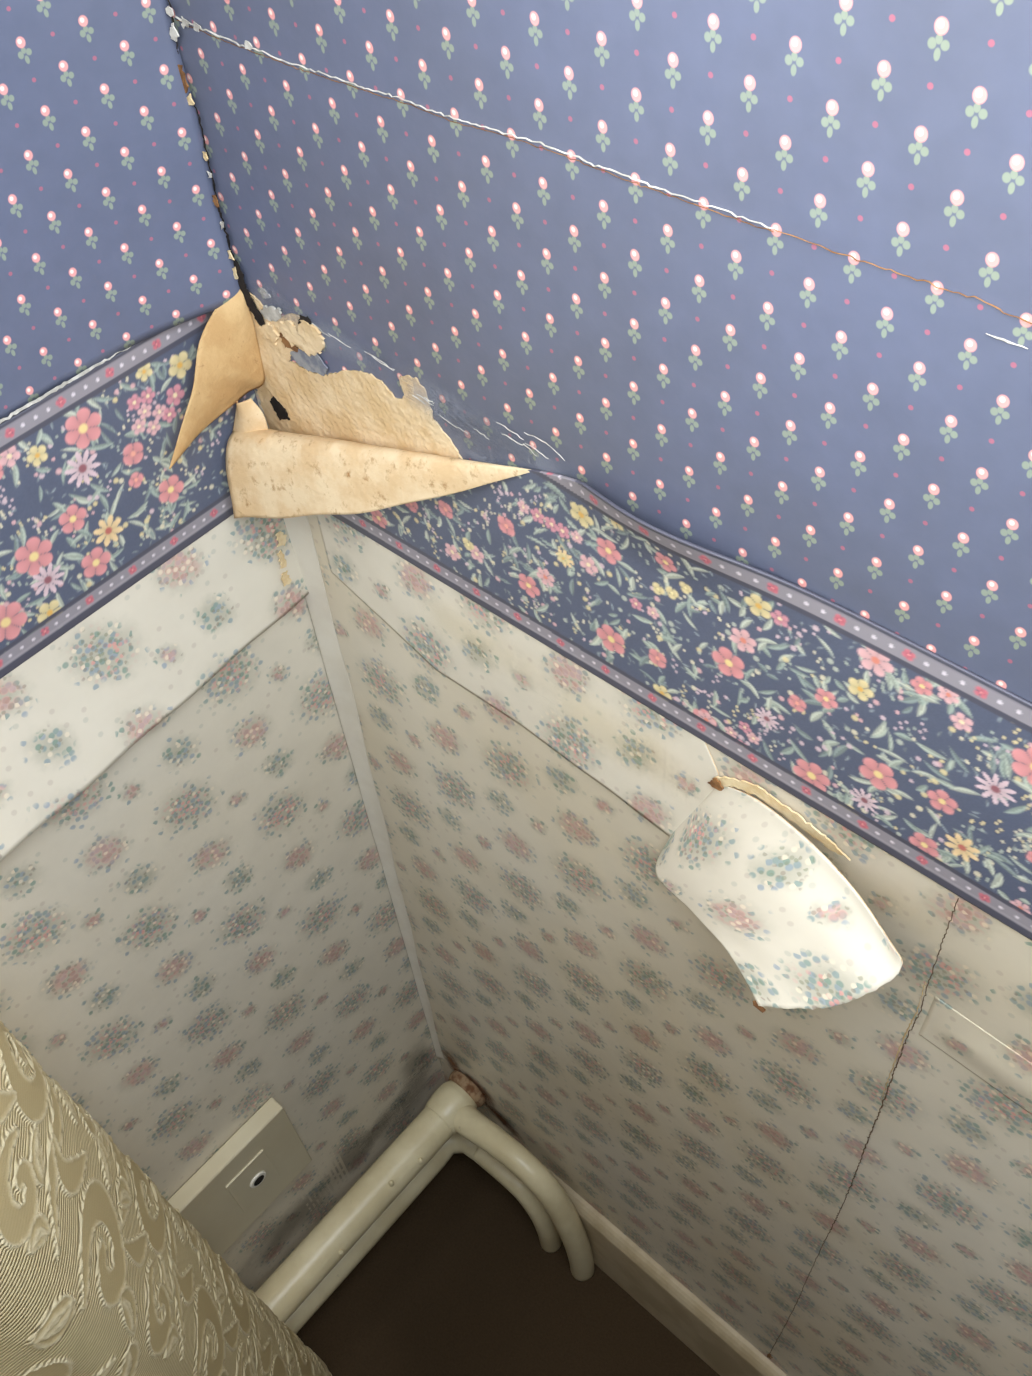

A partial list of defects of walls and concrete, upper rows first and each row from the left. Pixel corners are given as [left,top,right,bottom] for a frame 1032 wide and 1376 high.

crack [165,0,1032,324]
peeling [169,287,531,587]
corrosion [445,1052,517,1136]
crack [767,898,959,1358]